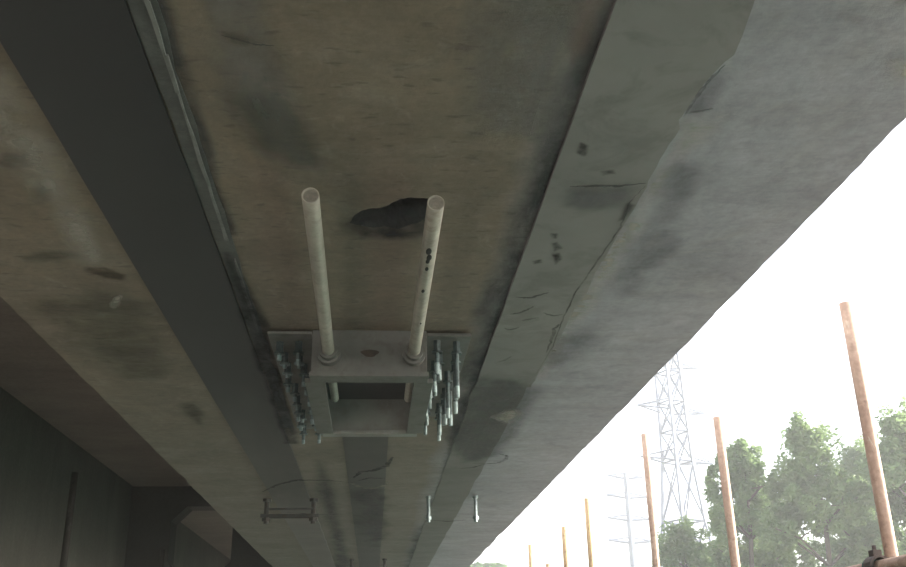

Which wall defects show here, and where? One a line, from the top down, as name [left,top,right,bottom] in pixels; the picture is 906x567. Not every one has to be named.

leakage [574,32,600,86]
spalling [350,197,428,238]
leakage [522,132,563,226]
leakage [465,250,523,381]
leakage [452,381,526,460]